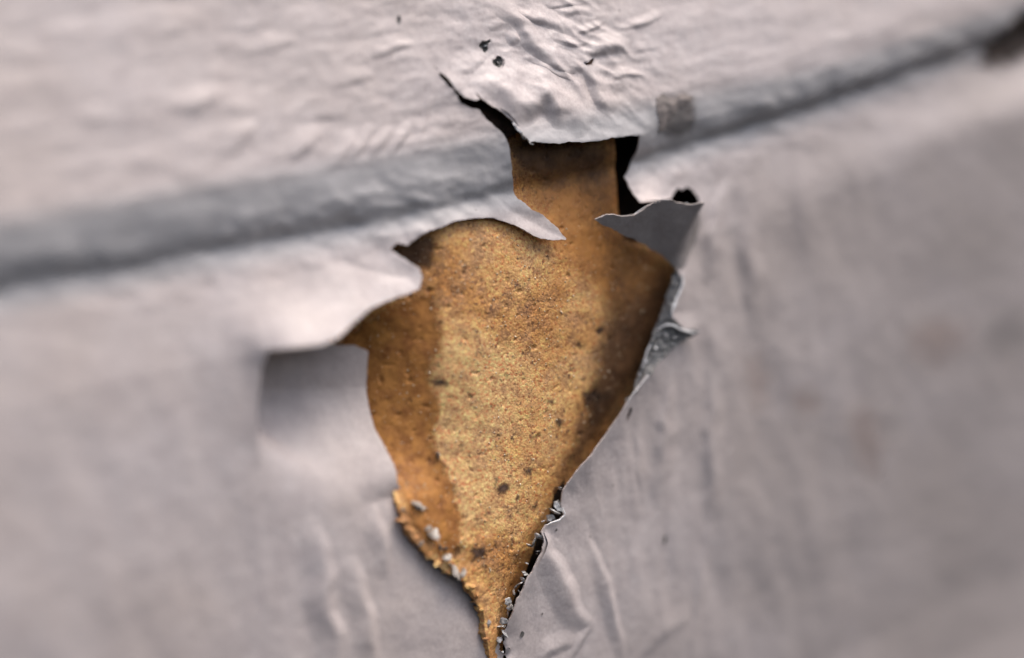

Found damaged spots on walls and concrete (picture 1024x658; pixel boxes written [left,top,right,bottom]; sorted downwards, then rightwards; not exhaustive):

peeling [257,122,704,658]